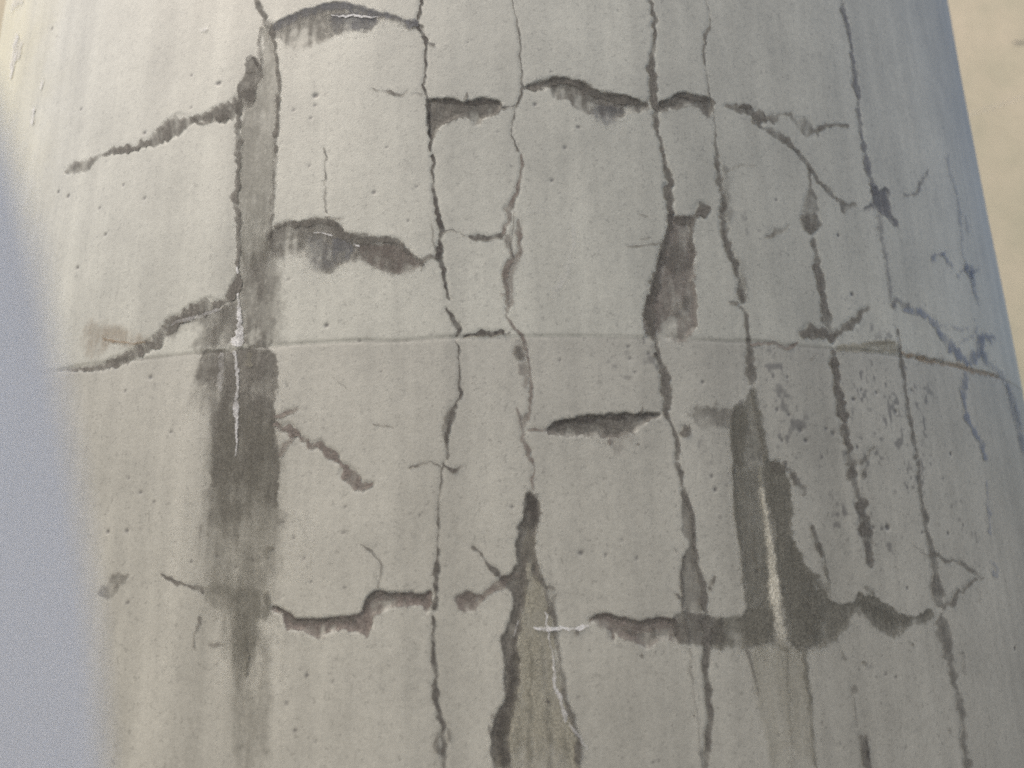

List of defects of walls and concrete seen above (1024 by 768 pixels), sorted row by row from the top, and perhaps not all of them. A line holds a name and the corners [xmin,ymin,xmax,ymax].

crack [65,87,255,173]
spalling [425,92,519,139]
spalling [524,75,716,117]
crack [59,273,242,371]
leakage [197,57,438,520]
spalling [272,544,432,638]
crack [372,0,535,768]
leakage [488,492,589,768]
spalling [528,407,660,445]
crack [631,0,726,768]
crack [703,2,929,568]
leakage [710,390,934,677]